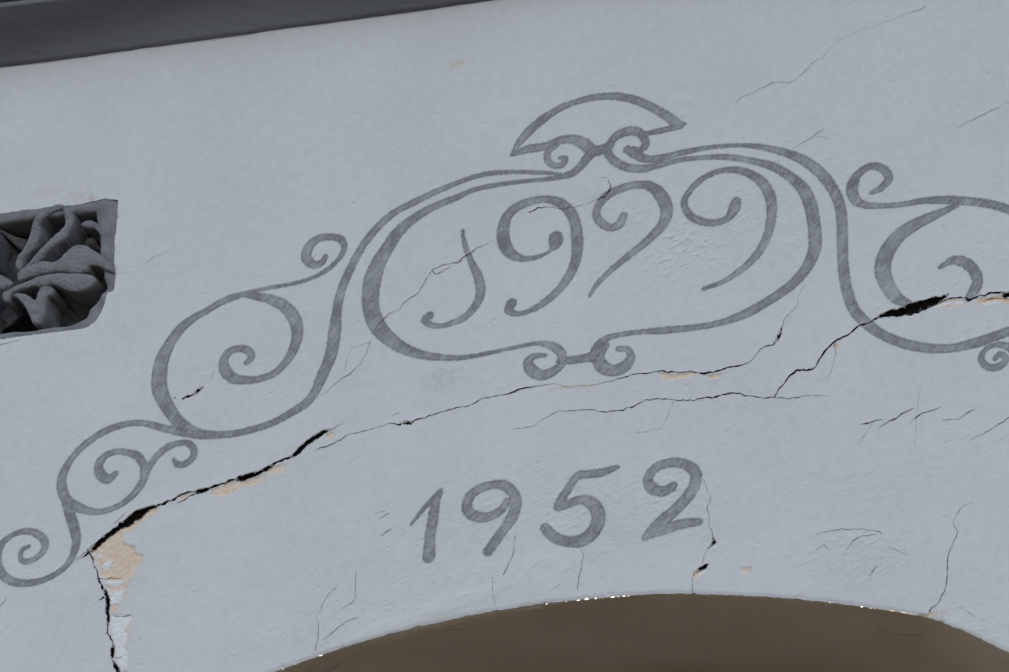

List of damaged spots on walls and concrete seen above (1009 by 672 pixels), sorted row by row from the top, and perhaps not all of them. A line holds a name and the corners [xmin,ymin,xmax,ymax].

crack [529,170,616,213]
crack [320,240,494,396]
spalling [935,294,1009,309]
spalling [208,462,286,498]
crack [76,288,1009,672]
spalling [88,507,160,670]